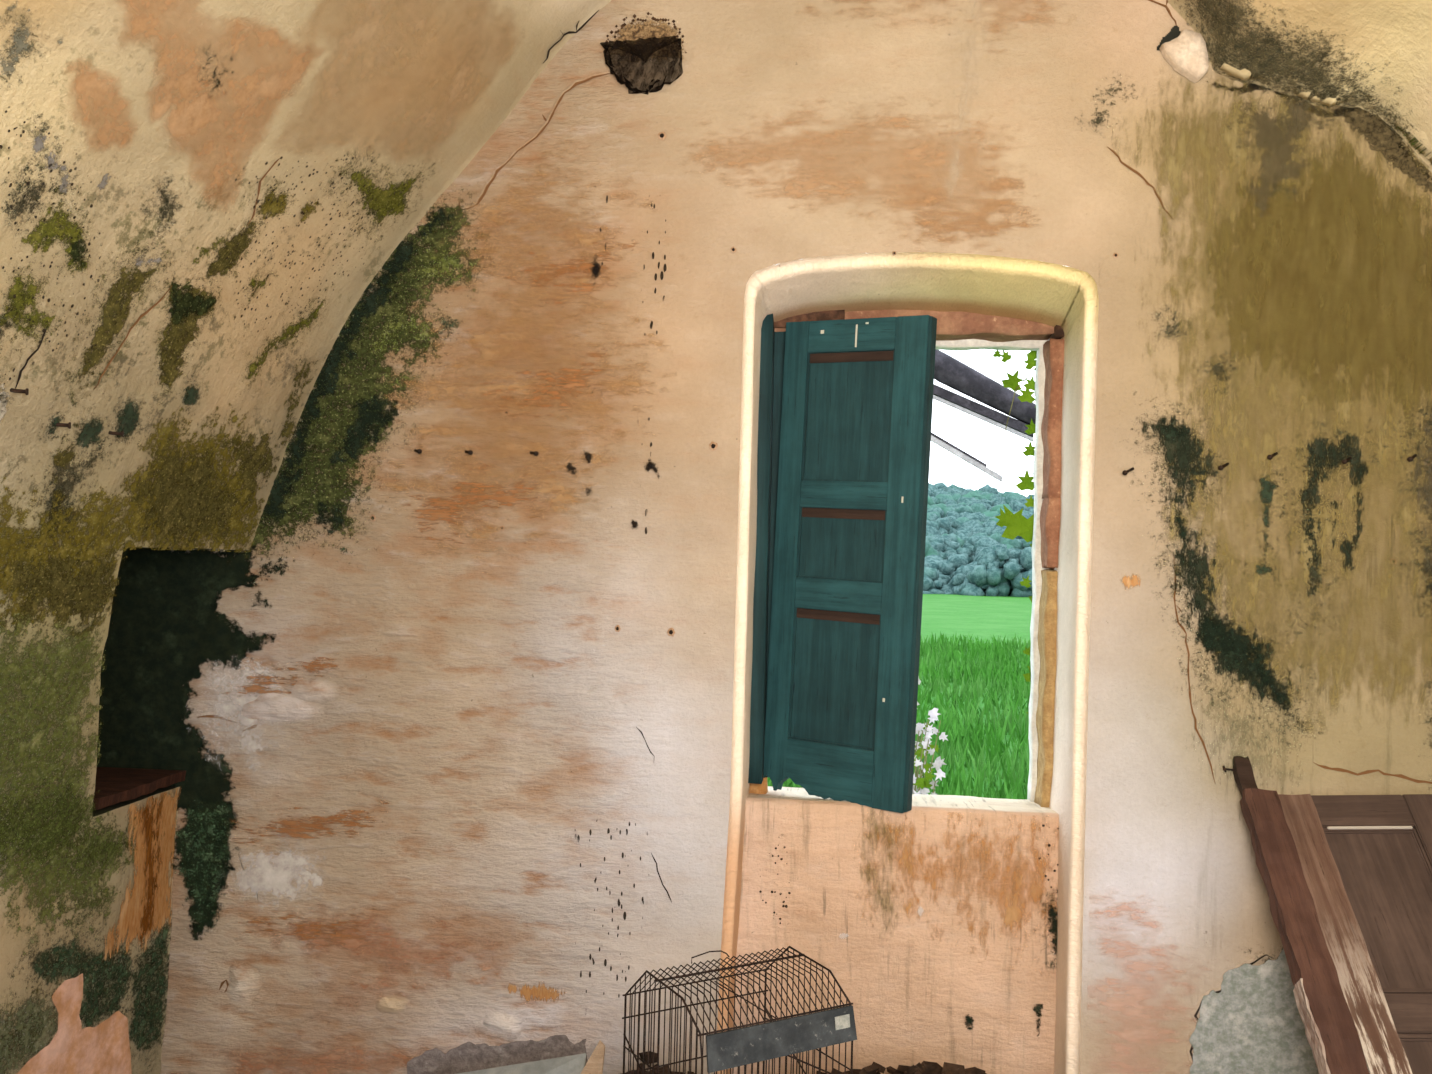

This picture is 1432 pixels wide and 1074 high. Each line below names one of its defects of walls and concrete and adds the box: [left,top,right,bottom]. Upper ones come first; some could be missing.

crack [459,10,610,210]
damp [0,106,110,352]
damp [1131,0,1432,744]
damp [32,394,155,538]
damp [97,546,388,941]
crack [1173,563,1215,782]
flaking render [16,973,132,1074]
damp [122,909,172,1073]
damp [575,820,649,997]
damp [1033,1004,1043,1036]
damp [1038,824,1059,968]
flaking render [1189,948,1319,1074]